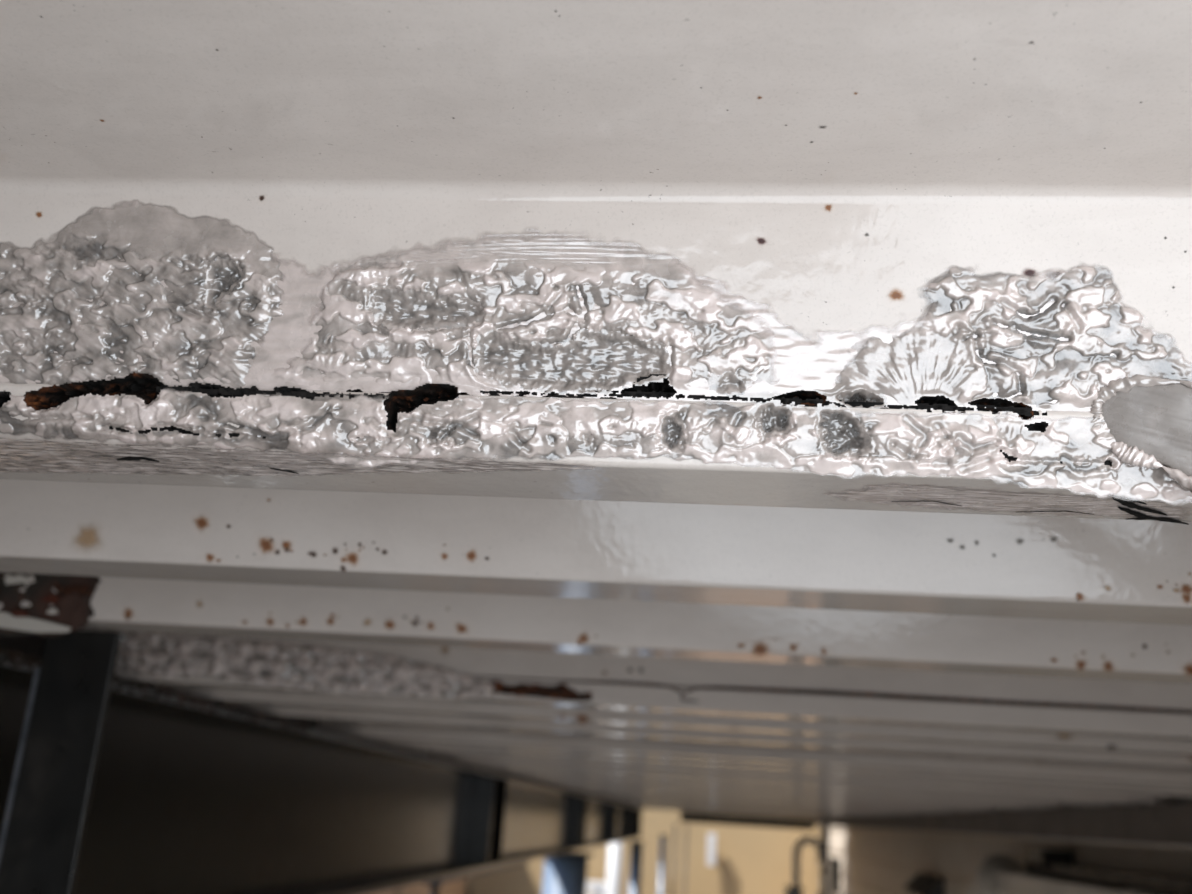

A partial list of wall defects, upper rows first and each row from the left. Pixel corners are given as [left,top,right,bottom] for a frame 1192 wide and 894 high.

crack [480,374,1047,416]
crack [0,372,389,462]
crack [1000,450,1018,462]
corrosion [78,529,96,546]
corrosion [254,538,293,555]
corrosion [308,542,387,571]
corrosion [1157,573,1192,602]
corrosion [0,572,101,638]
corrosion [385,615,434,629]
corrosion [738,638,776,656]